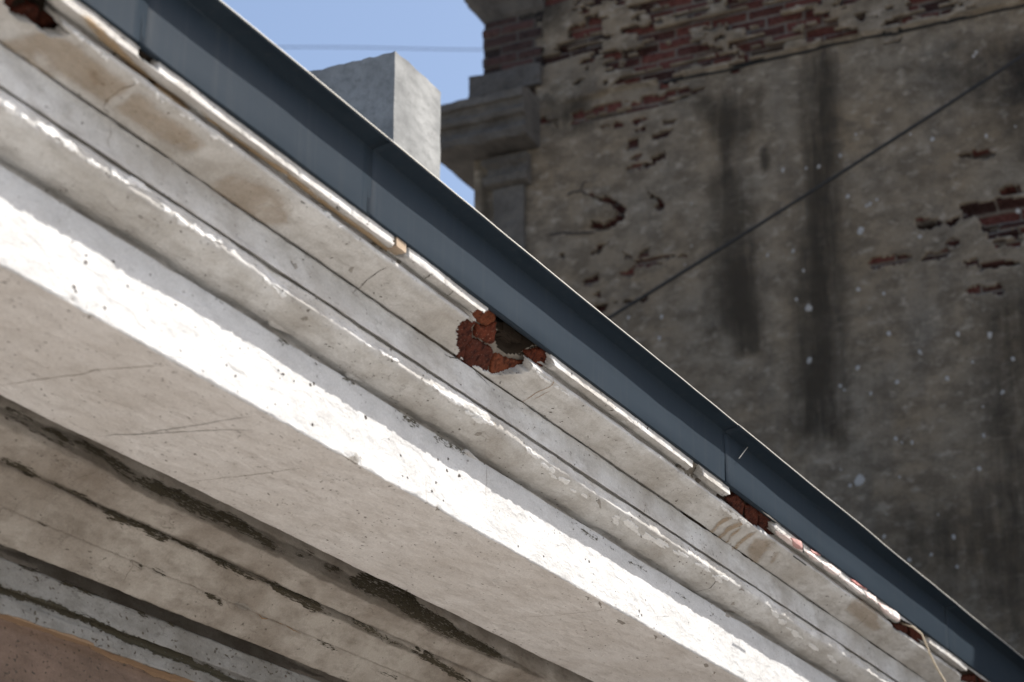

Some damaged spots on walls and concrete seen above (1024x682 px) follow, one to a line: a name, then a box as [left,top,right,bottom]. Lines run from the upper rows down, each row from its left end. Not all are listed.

spalling [3,0,60,29]
flaking render [545,0,963,171]
spalling [414,309,569,405]
spalling [589,193,627,231]
damp [702,98,759,351]
damp [801,63,836,433]
spalling [868,186,1024,272]
spalling [966,284,1005,295]
damp [1,407,278,551]
damp [55,483,334,621]
spalling [683,512,753,561]
peeling [716,489,925,643]